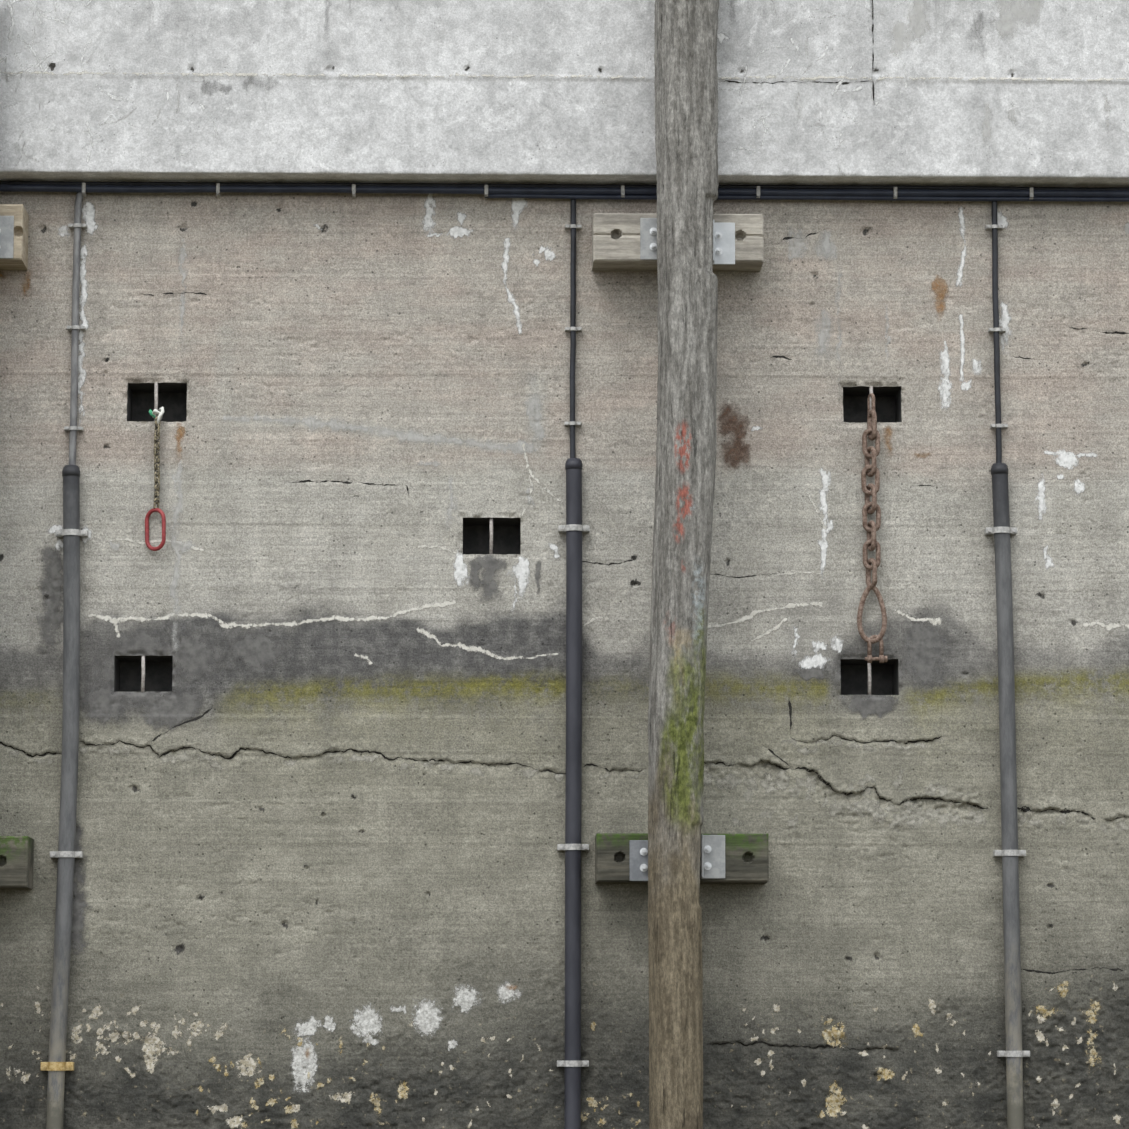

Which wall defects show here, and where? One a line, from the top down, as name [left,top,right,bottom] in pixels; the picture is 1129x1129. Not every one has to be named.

water stain [718,0,1126,124]
crack [1066,326,1129,334]
rust [719,405,750,468]
crack [87,600,558,660]
crack [0,708,646,782]
crack [703,701,986,829]
crack [1017,806,1129,833]